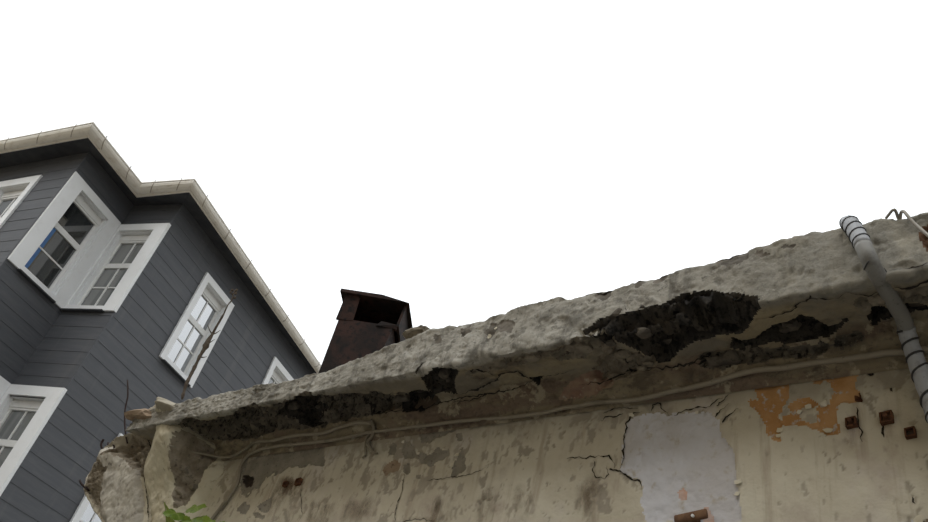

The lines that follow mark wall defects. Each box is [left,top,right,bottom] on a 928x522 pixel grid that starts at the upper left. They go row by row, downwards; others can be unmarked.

peeling [633,274,669,288]
crack [764,263,928,319]
spalling [867,306,892,326]
spalling [905,303,928,313]
crack [309,392,399,428]
spalling [168,289,874,522]
crack [415,352,719,406]
crack [567,395,738,487]
spalling [84,434,152,507]